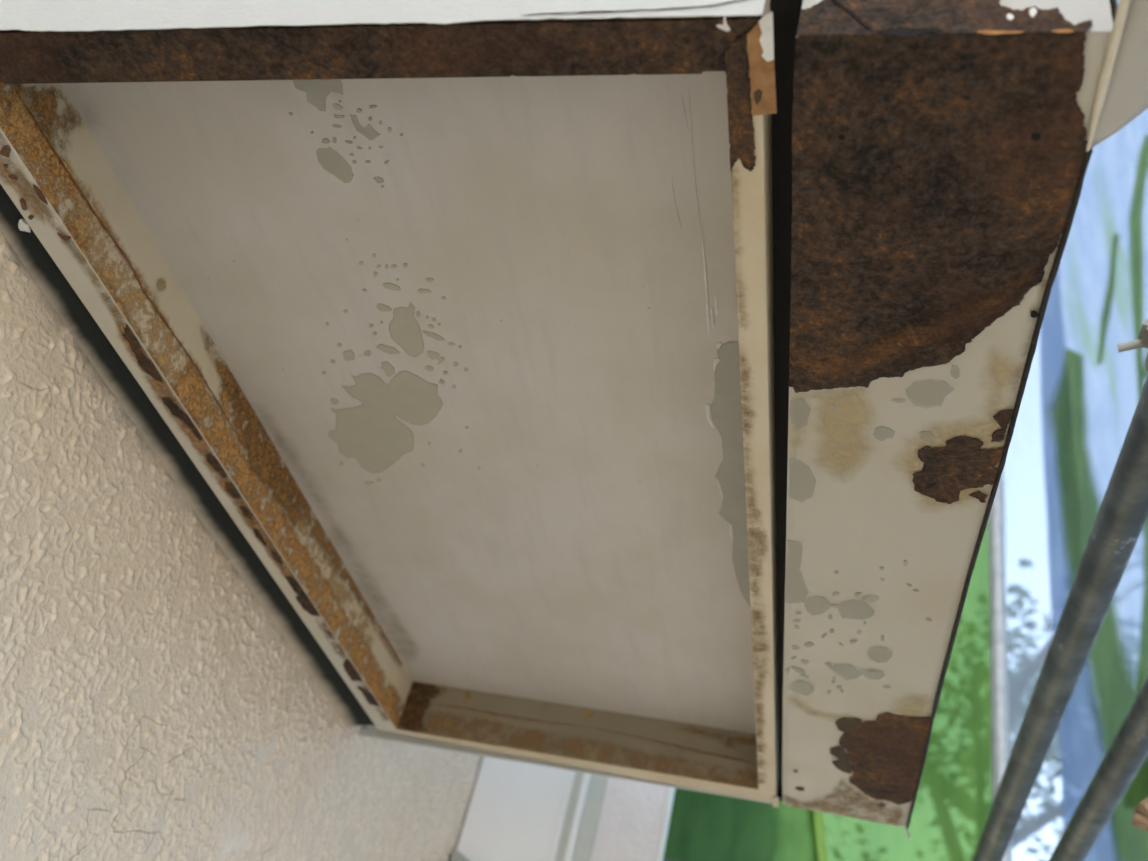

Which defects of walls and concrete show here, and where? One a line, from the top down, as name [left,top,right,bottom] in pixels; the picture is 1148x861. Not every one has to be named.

peeling [293,80,403,183]
corrosion [789,0,1093,393]
corrosion [0,14,764,788]
peeling [322,278,468,486]
peeling [705,342,750,606]
peeling [790,399,810,430]
peeling [789,459,816,502]
peeling [890,365,960,408]
corrosion [913,409,1013,504]
peeling [785,540,892,696]
corrosion [786,713,931,824]